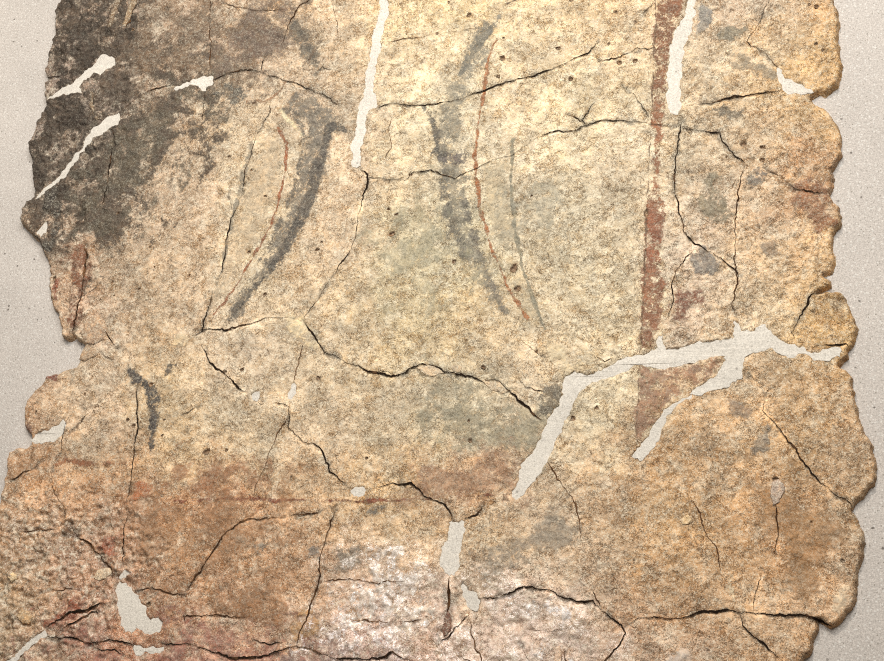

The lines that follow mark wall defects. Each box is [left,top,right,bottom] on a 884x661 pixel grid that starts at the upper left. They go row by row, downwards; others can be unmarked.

crack [202,0,335,119]
crack [378,41,653,157]
crack [702,88,782,104]
crack [72,246,88,331]
crack [196,92,822,496]
crack [6,389,139,578]
crack [381,482,504,520]
crack [747,371,852,505]
crack [48,602,131,654]
crack [139,510,410,661]
crack [441,579,482,661]
crack [485,573,831,661]